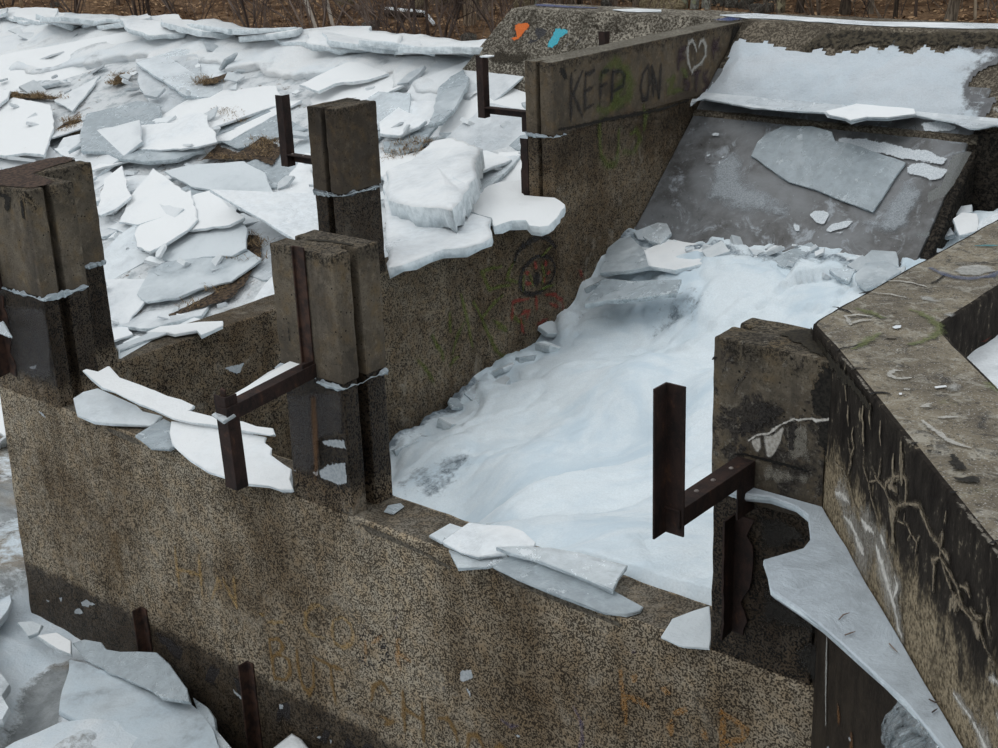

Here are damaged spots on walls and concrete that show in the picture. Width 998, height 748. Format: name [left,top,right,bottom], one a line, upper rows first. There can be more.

crack [735,418,829,472]